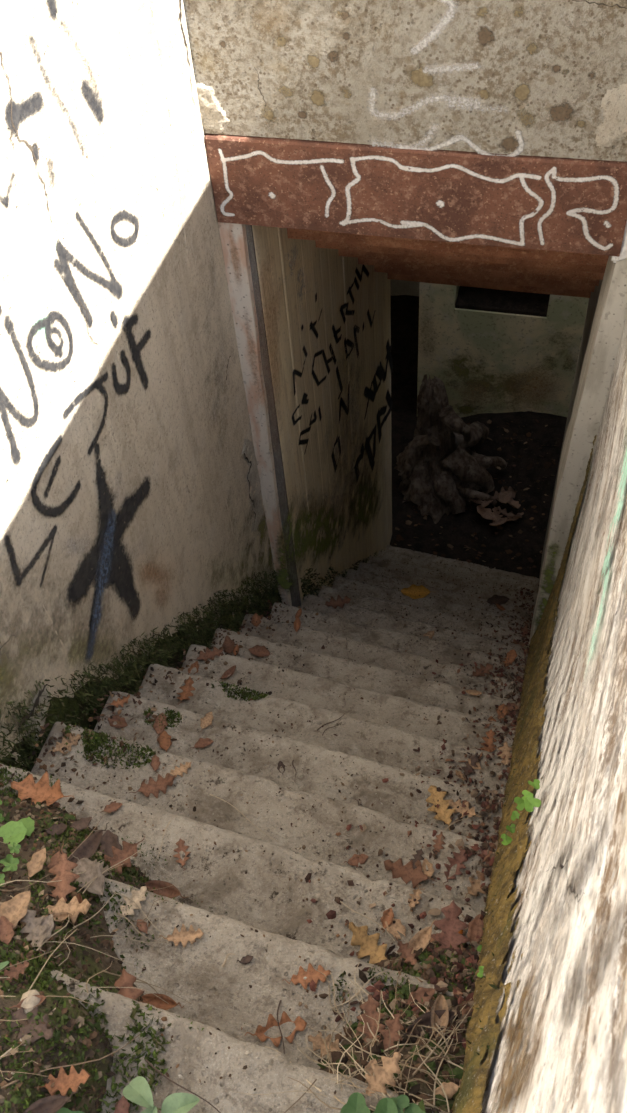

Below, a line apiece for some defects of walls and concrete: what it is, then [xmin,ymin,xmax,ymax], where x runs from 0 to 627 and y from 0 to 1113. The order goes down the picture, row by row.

crack [178,0,195,104]